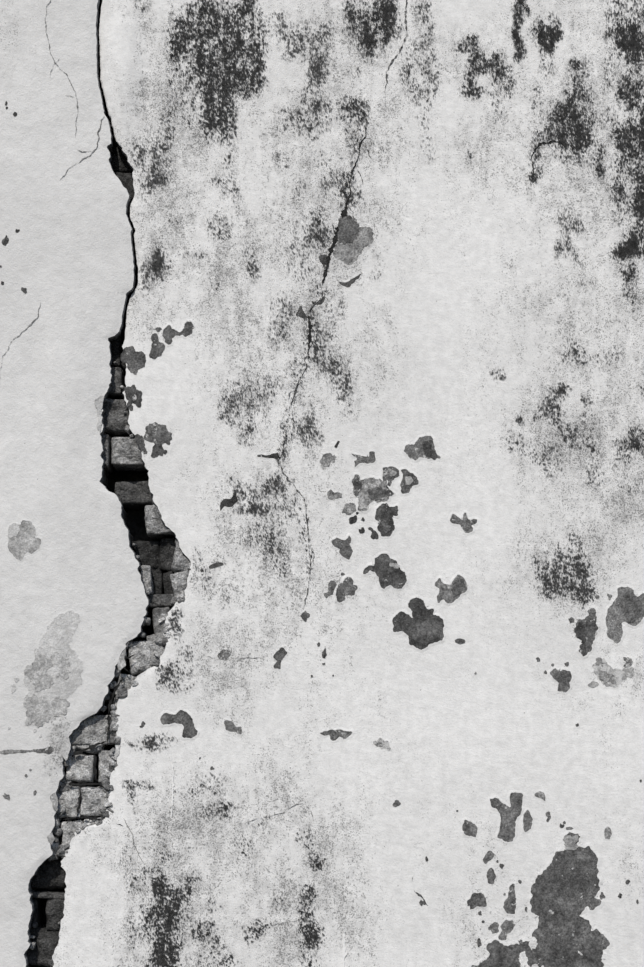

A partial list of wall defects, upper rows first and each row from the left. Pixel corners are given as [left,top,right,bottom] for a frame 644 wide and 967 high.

crack [45,0,134,204]
crack [384,0,408,92]
leakage [451,0,644,311]
crack [26,337,191,967]
spalling [96,0,223,572]
leakage [129,0,441,585]
crack [275,117,372,607]
peeling [318,433,470,653]
leakage [506,382,604,489]
peeling [569,584,644,689]
leakage [120,847,238,967]
flaking render [464,789,614,967]